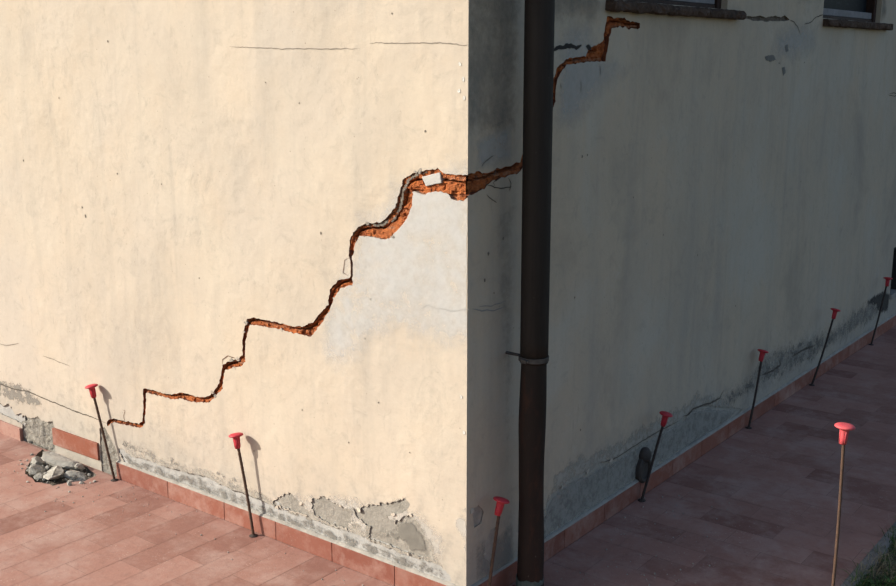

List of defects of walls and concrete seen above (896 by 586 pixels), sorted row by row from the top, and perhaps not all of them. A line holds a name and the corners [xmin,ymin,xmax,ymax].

crack [229,42,465,50]
crack [553,16,637,99]
crack [0,154,523,428]
flaking render [0,403,451,581]